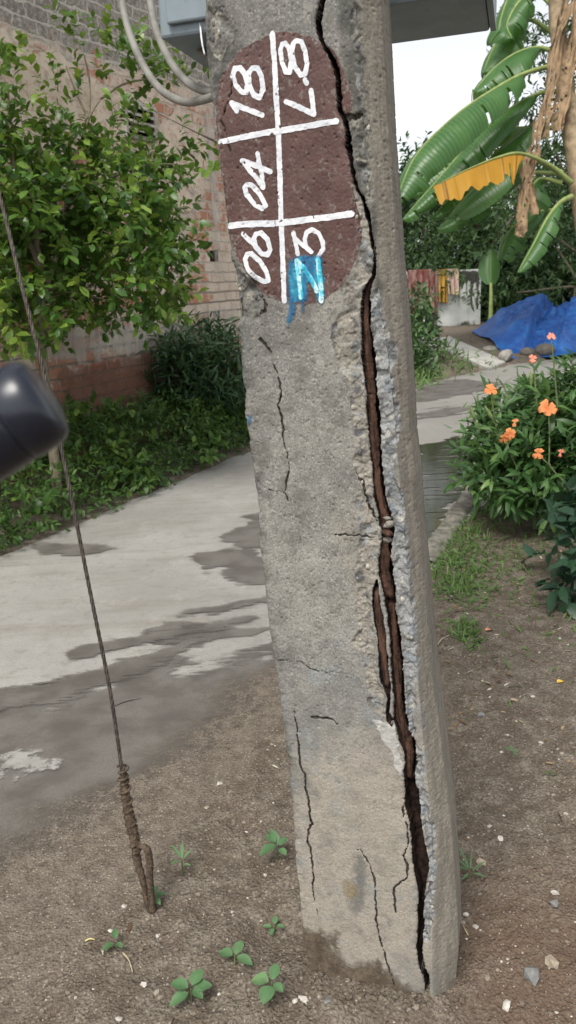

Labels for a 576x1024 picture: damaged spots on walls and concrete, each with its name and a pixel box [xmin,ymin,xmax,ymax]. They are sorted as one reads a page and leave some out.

crack [258,299,290,501]
crack [315,0,430,990]
spalling [330,3,436,942]
water stain [0,513,275,866]
crack [294,711,338,913]